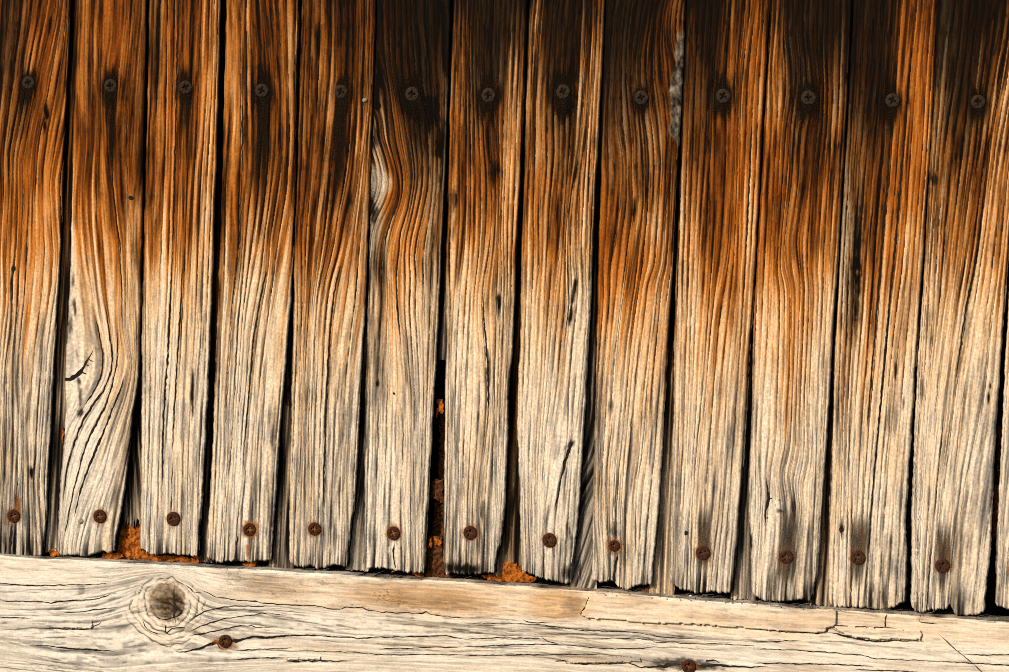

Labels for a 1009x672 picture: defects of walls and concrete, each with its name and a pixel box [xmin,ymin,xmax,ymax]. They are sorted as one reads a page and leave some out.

crack [64,308,124,536]
rust [412,399,457,578]
rust [102,522,211,563]
rust [241,520,269,567]
rust [481,562,538,583]
crack [611,554,619,581]
crack [1,583,115,651]
crack [143,585,1009,672]